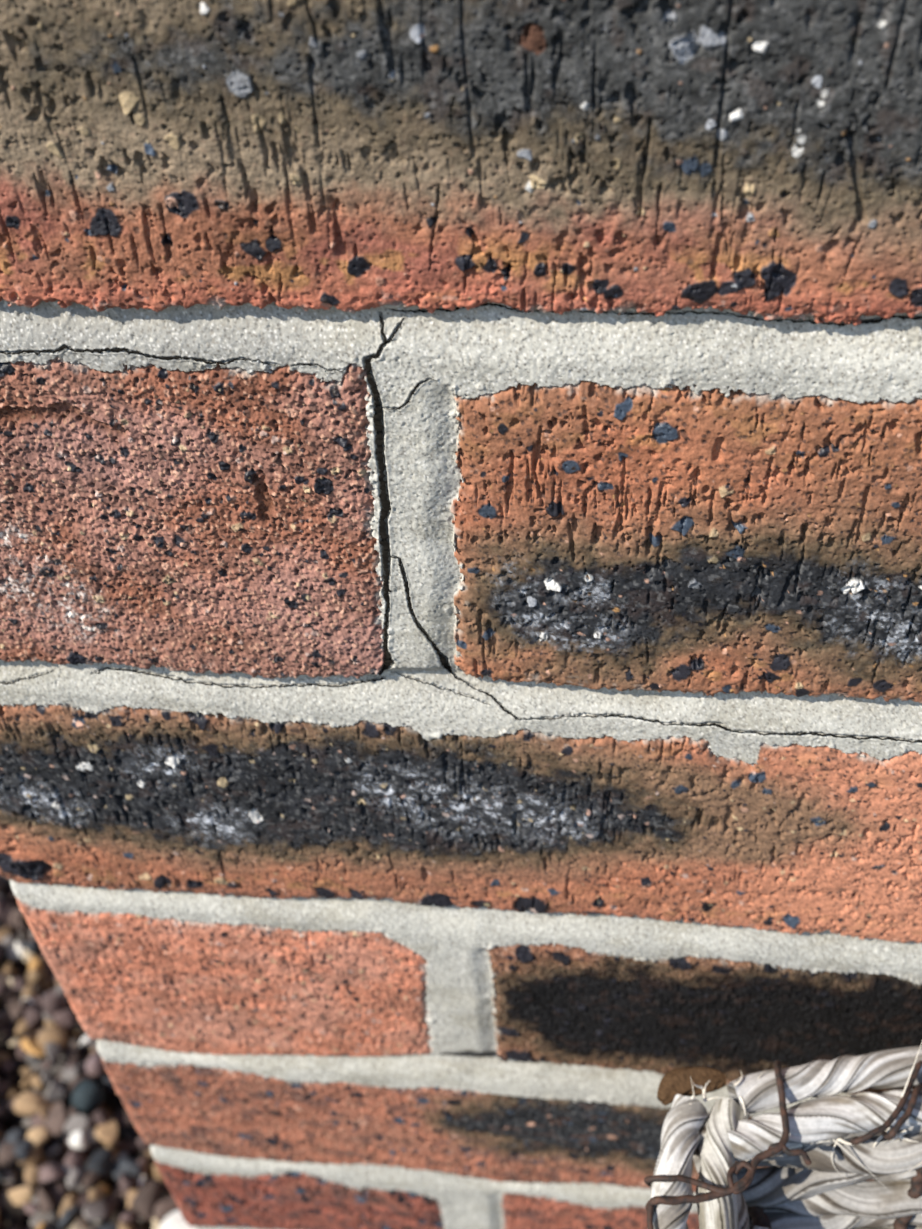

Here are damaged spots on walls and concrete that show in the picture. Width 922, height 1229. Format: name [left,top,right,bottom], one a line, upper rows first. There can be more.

water stain [18,0,922,205]
crack [0,303,922,743]
water stain [481,537,922,678]
water stain [0,726,697,861]
water stain [494,960,922,1076]